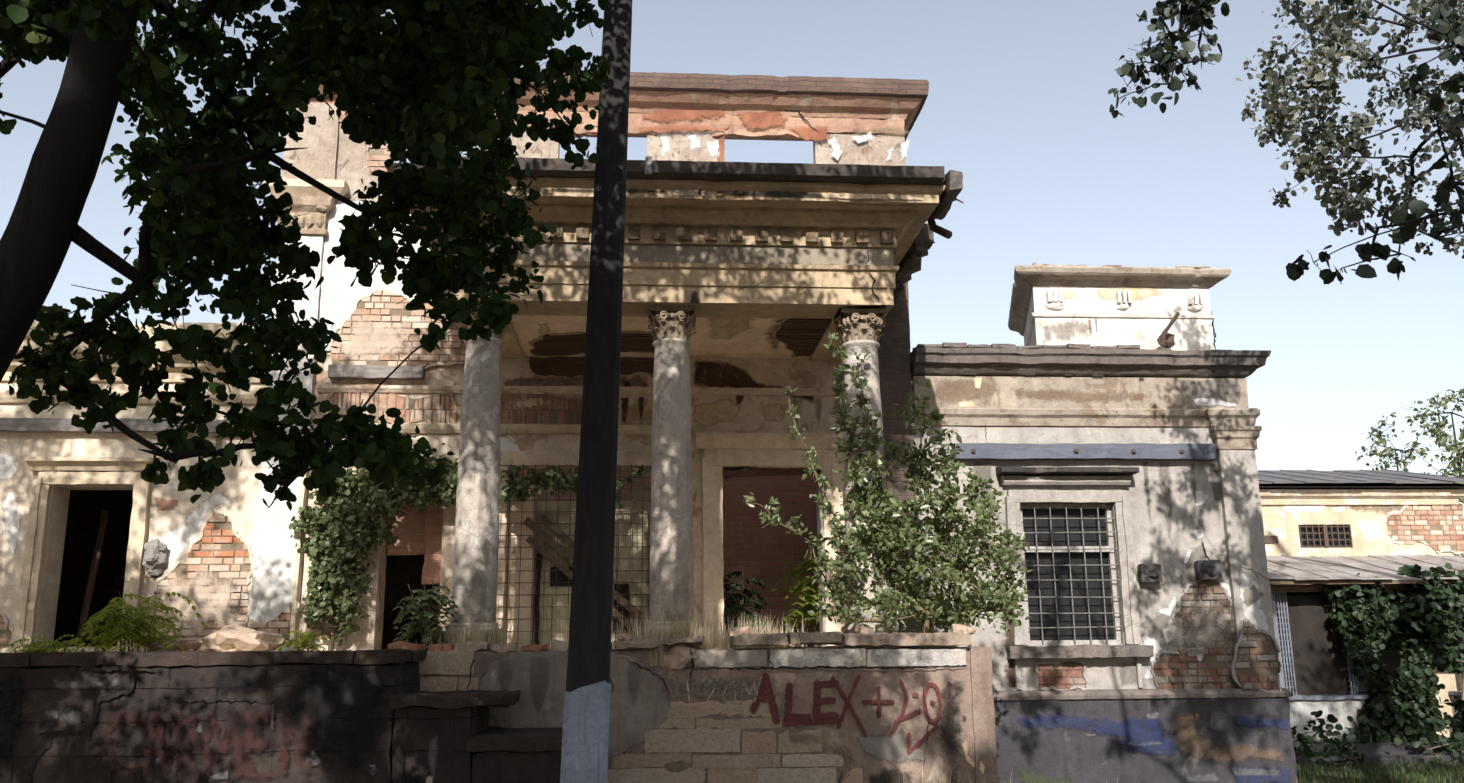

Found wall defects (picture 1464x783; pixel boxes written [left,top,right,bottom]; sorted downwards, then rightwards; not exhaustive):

peeling [660,133,671,157]
peeling [687,133,720,157]
flaking render [327,287,466,424]
flaking render [0,613,14,653]
peeling [0,453,21,573]
flaking render [141,493,345,646]
flaking render [1137,528,1283,692]
flaking render [1358,502,1464,555]